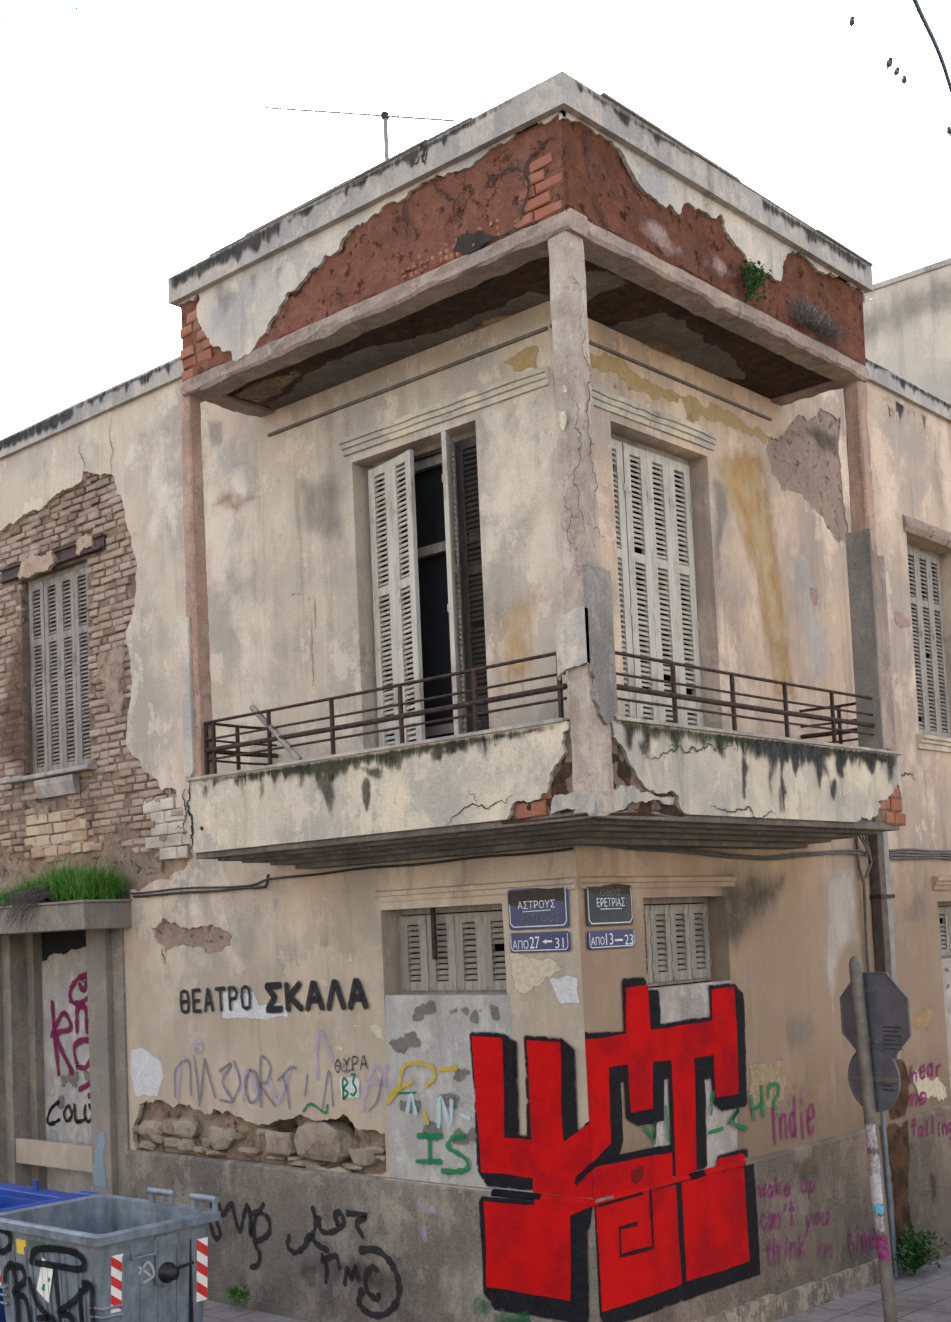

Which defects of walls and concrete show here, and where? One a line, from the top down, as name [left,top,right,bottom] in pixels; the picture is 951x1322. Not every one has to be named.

flaking render [0,472,194,899]